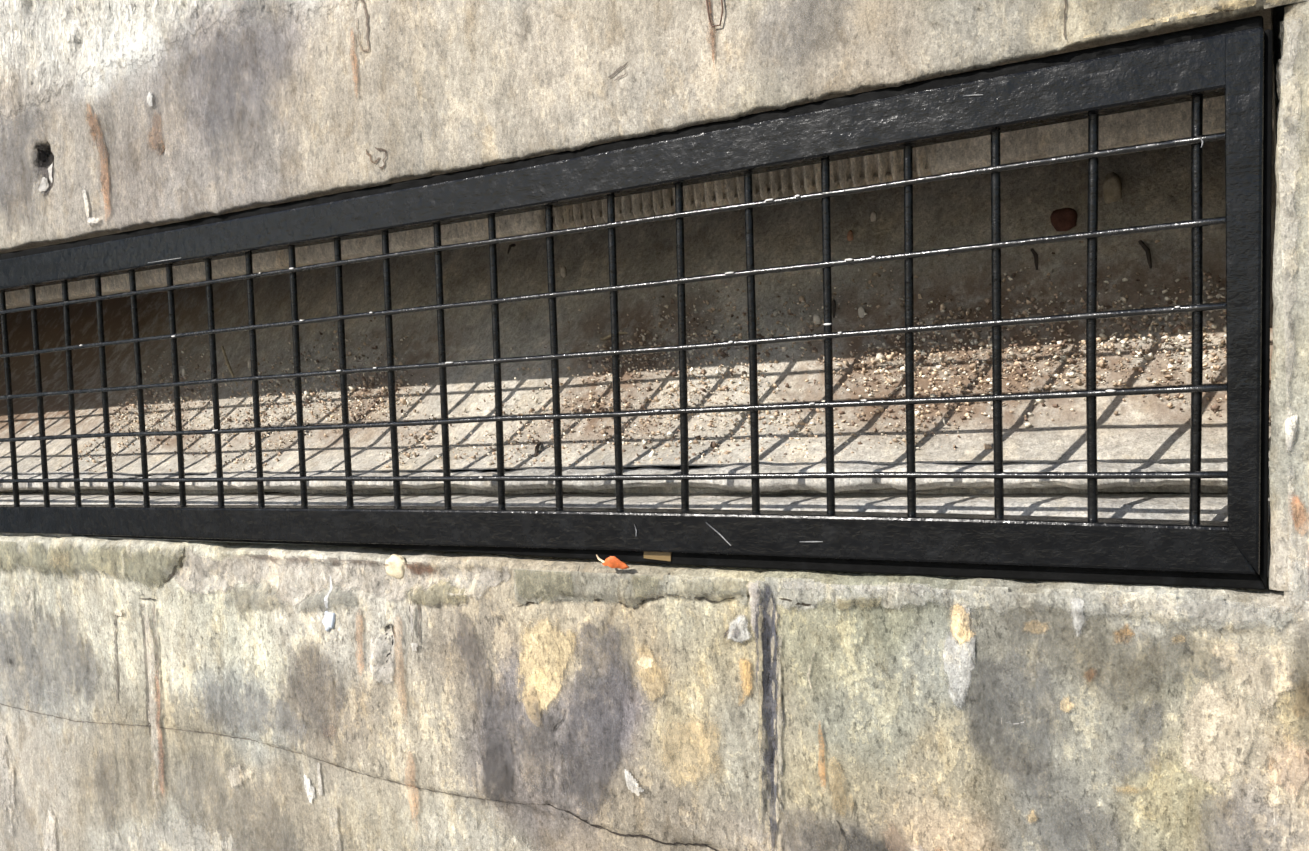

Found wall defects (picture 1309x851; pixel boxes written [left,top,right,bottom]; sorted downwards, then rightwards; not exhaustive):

spalling [1084,0,1291,38]
rust [87,104,109,209]
crack [0,703,719,851]
water stain [457,617,665,809]
water stain [662,720,718,786]
water stain [739,659,752,704]